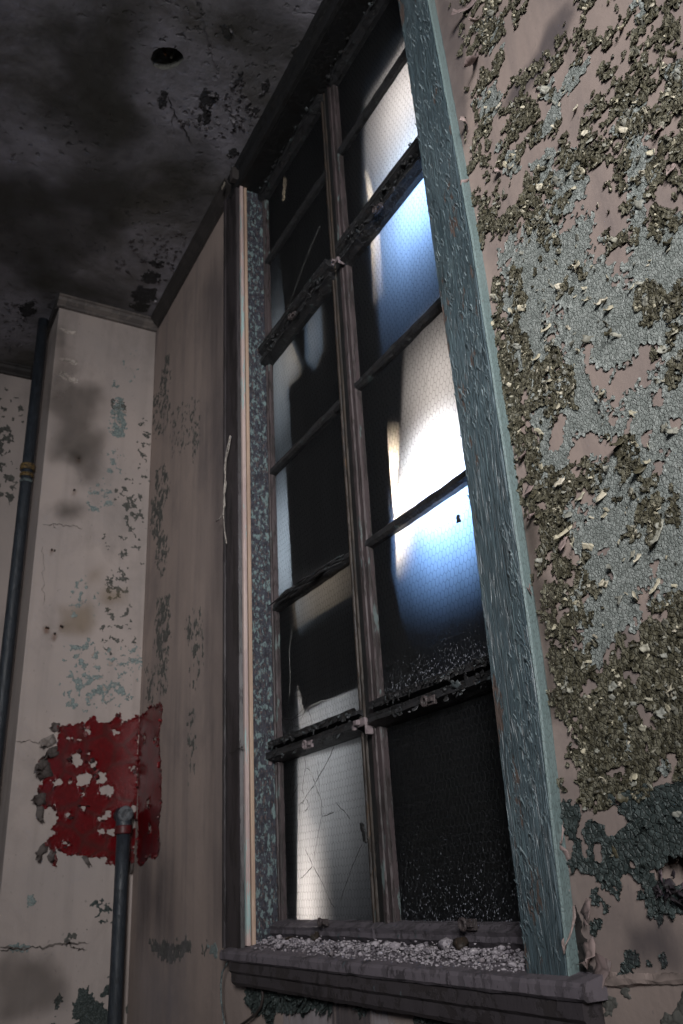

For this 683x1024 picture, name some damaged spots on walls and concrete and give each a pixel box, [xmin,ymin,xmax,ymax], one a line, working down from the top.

peeling [0,387,24,505]
peeling [59,350,200,723]
peeling [443,0,683,969]
peeling [186,606,204,689]
crack [0,942,88,952]